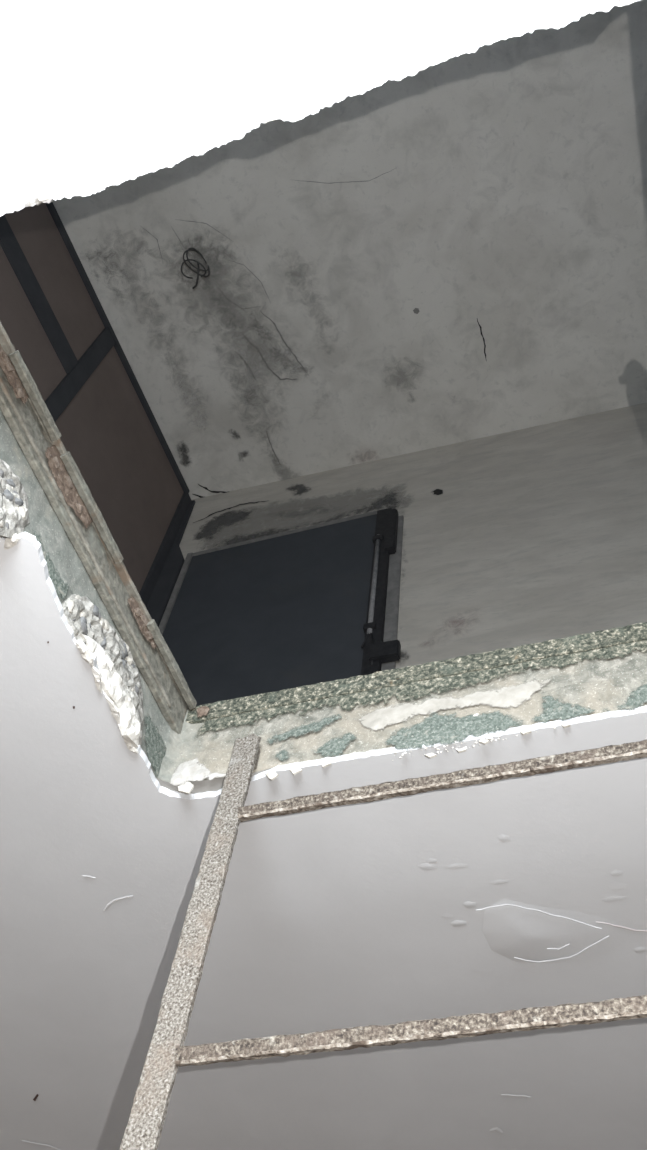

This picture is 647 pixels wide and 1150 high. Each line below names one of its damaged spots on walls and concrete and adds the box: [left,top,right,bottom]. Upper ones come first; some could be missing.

crack [477,319,487,361]
leakage [178,443,190,465]
spalling [0,459,226,794]